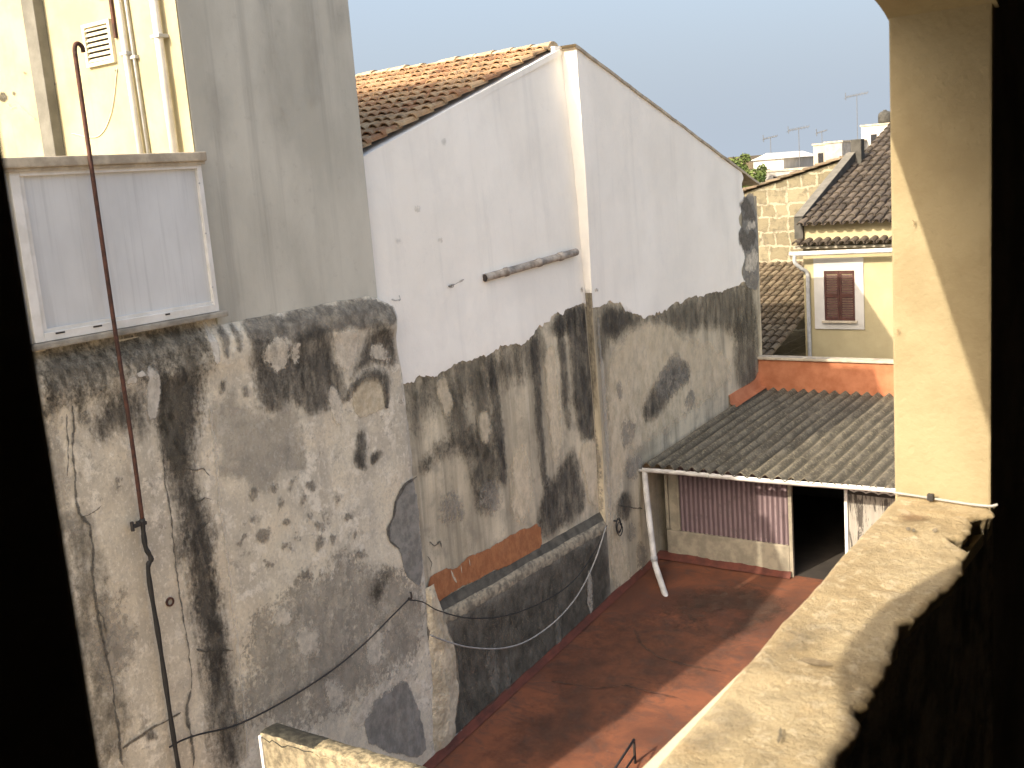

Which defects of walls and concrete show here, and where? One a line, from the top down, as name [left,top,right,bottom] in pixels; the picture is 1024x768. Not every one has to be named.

crack [66,406,233,766]
damp [36,299,425,768]
peeling [387,476,542,601]
damp [406,284,758,537]
damp [618,493,647,570]